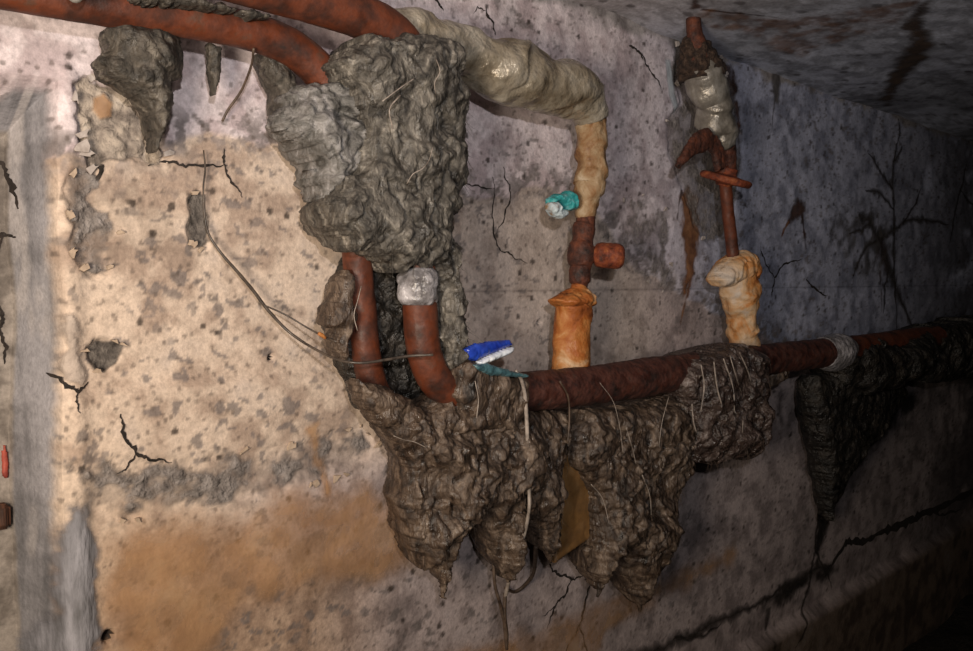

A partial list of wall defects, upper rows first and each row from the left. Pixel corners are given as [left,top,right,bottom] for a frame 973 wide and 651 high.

crack [0,161,19,209]
spalling [65,74,174,274]
rust [677,186,699,319]
crack [851,119,973,329]
crack [0,307,9,364]
crack [46,372,88,413]
flaking render [58,314,128,386]
crack [117,414,172,474]
damp [116,534,221,651]
damp [222,494,401,593]
crack [544,564,590,651]
crack [641,489,973,651]